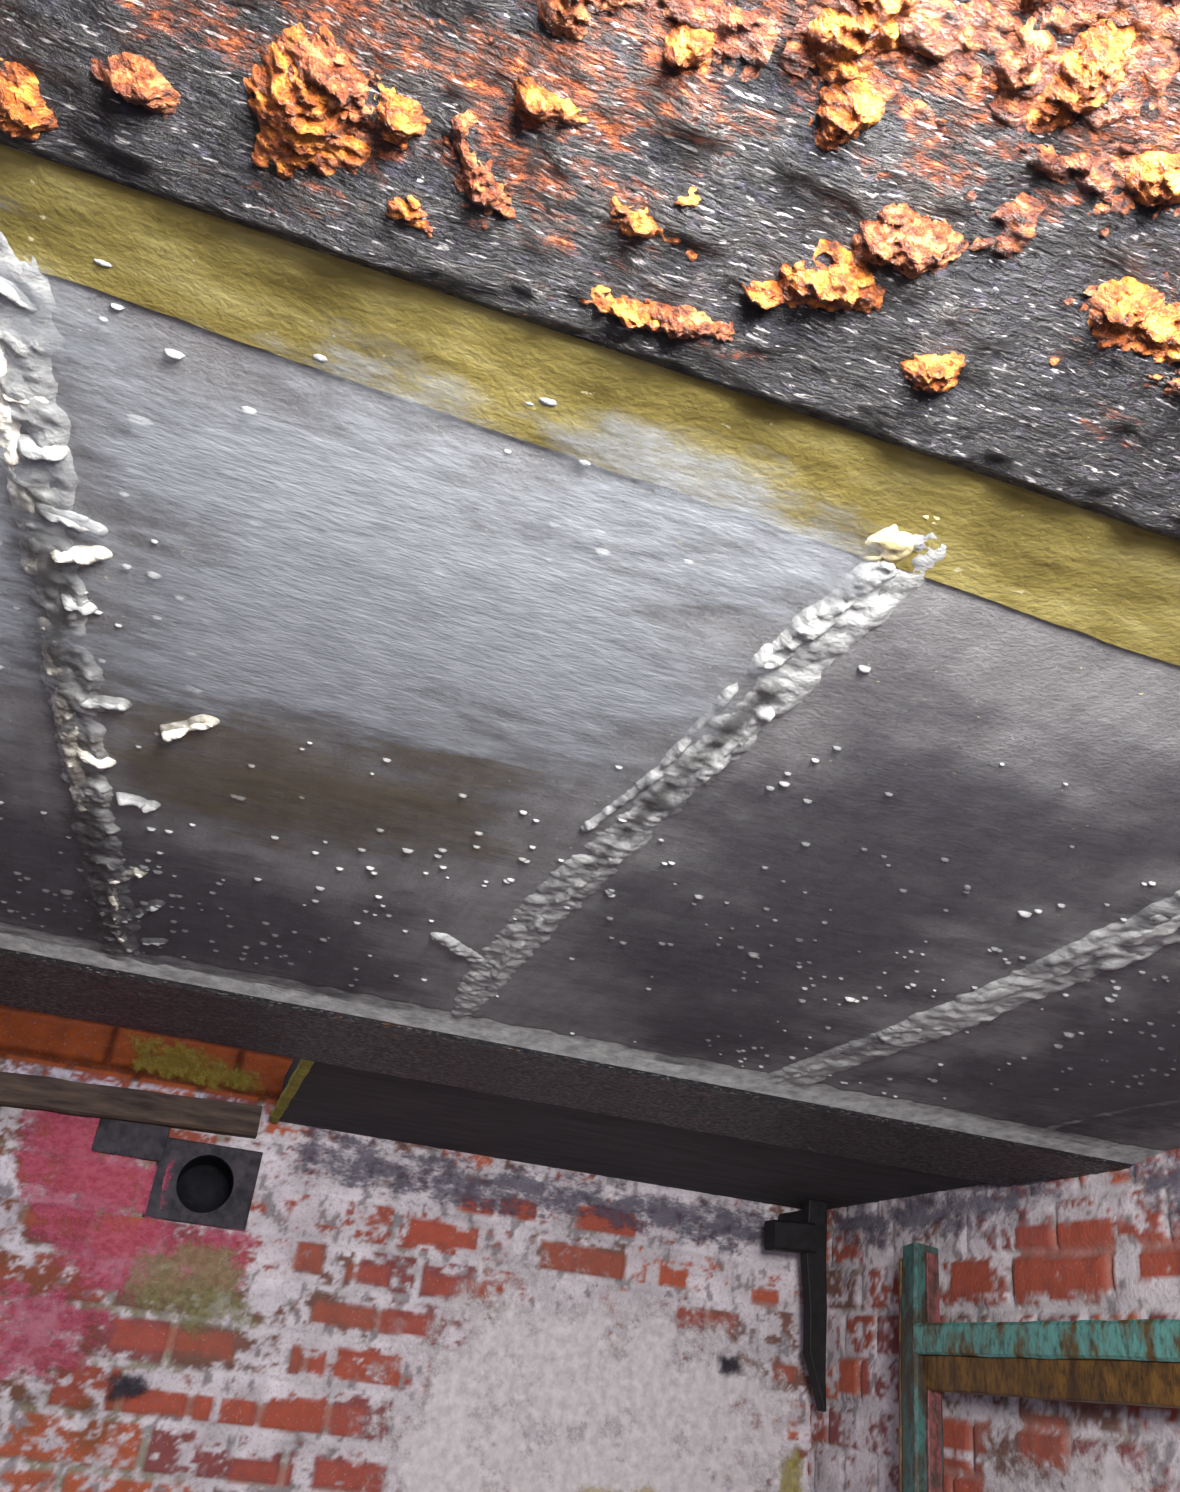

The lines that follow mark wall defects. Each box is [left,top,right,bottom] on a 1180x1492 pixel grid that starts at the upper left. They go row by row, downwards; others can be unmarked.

rust [429,18,495,45]
rust [625,0,1180,236]
rust [963,191,1047,258]
rust [1063,285,1099,305]
damp [828,948,1180,1145]
peeling [367,1258,793,1492]
peeling [984,1438,1152,1492]